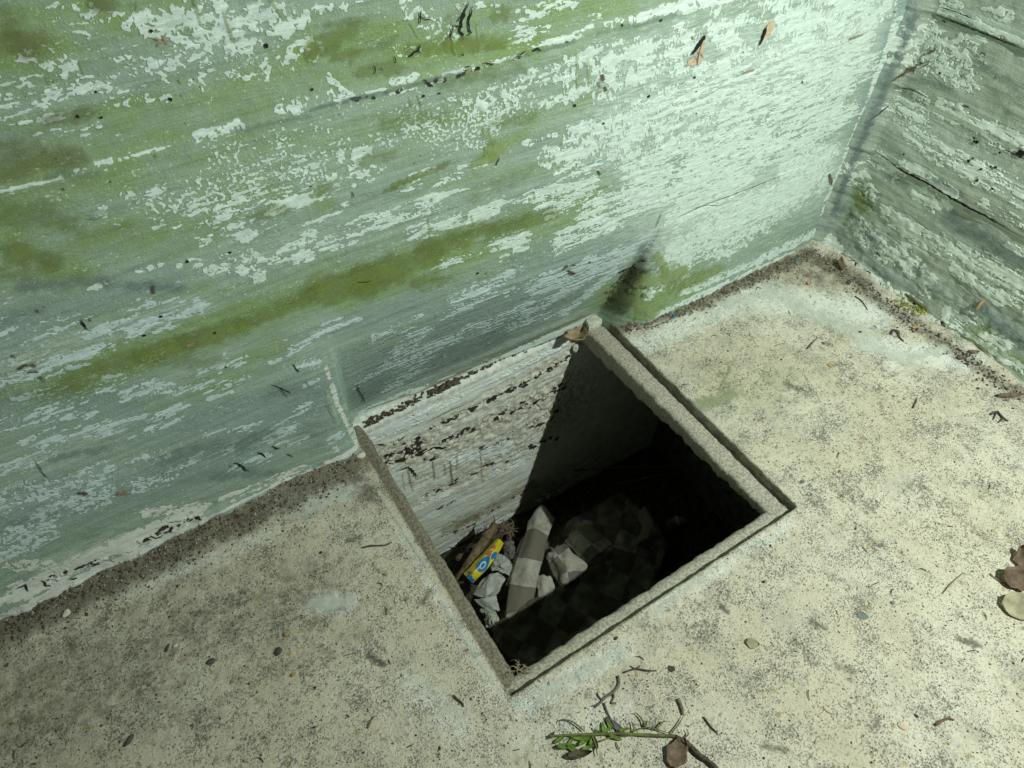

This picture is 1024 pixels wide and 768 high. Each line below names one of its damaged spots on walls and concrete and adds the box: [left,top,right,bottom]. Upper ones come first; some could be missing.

peeling [0,0,364,137]
peeling [144,118,387,244]
peeling [175,159,488,284]
water stain [305,238,470,304]
water stain [385,162,448,191]
water stain [611,252,722,321]
peeling [385,0,1024,289]
peeling [655,228,816,318]
peeling [848,203,1024,313]
crack [876,152,1020,237]
water stain [368,315,585,410]
spalling [0,228,792,696]